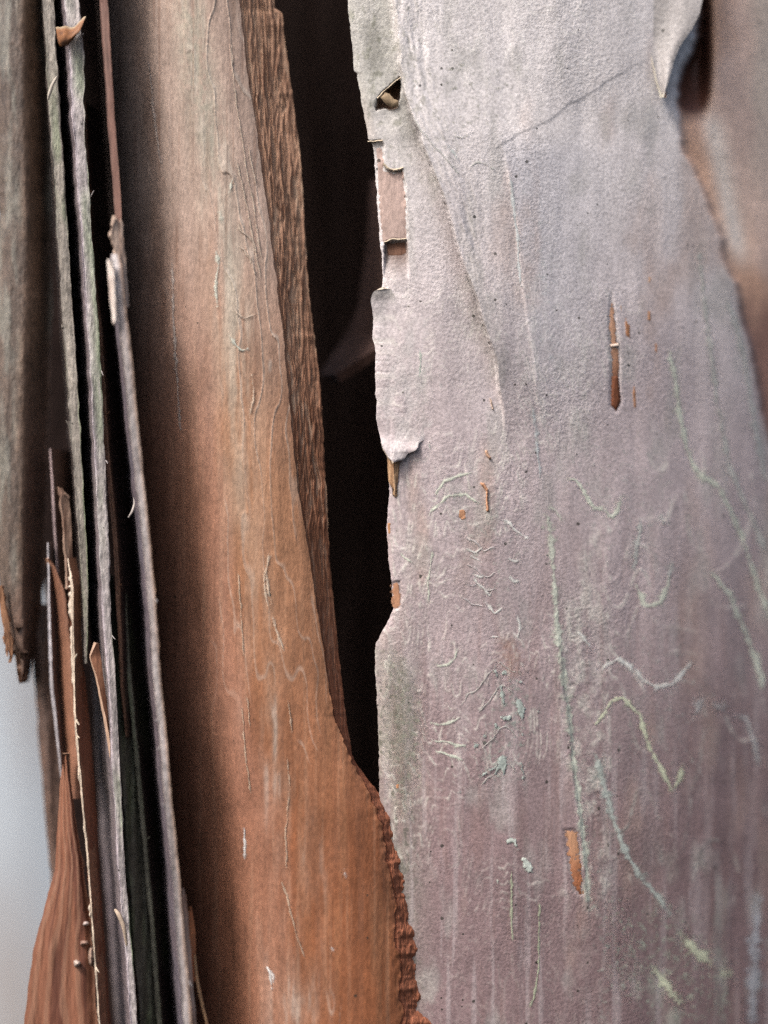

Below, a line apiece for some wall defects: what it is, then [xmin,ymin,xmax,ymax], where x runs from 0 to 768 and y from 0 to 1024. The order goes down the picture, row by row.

peeling [371,287,442,464]